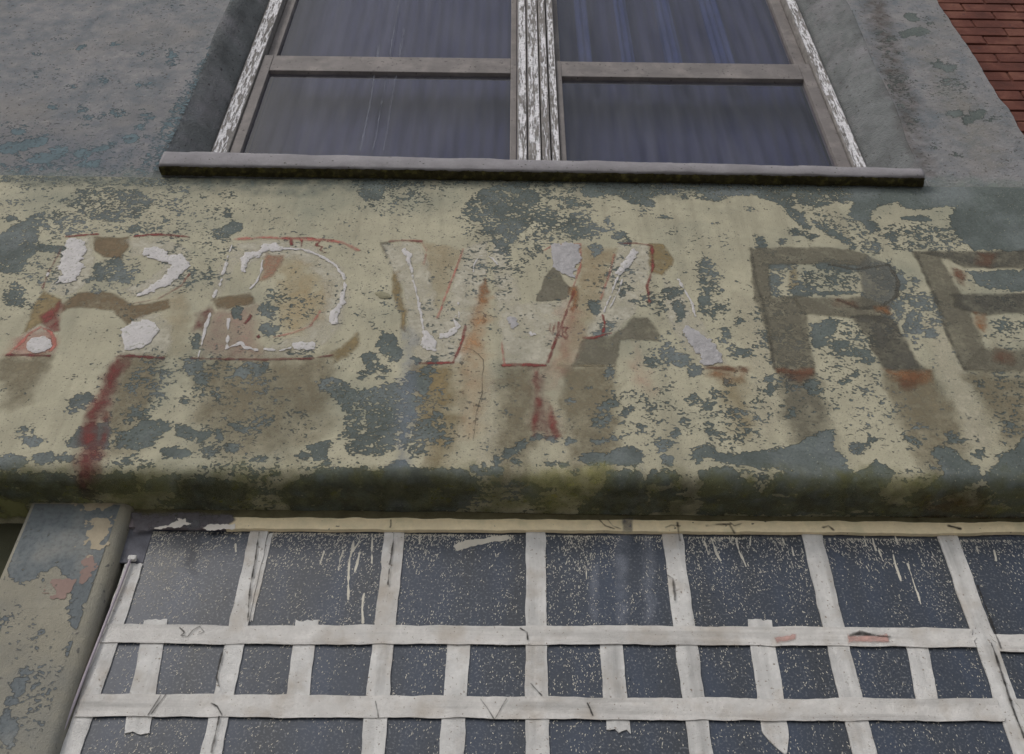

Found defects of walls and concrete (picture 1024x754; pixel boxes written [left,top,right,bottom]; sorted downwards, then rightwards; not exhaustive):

peeling [518,0,560,160]
peeling [786,0,866,167]
peeling [855,1,1002,171]
peeling [0,0,306,361]
peeling [0,161,1024,629]